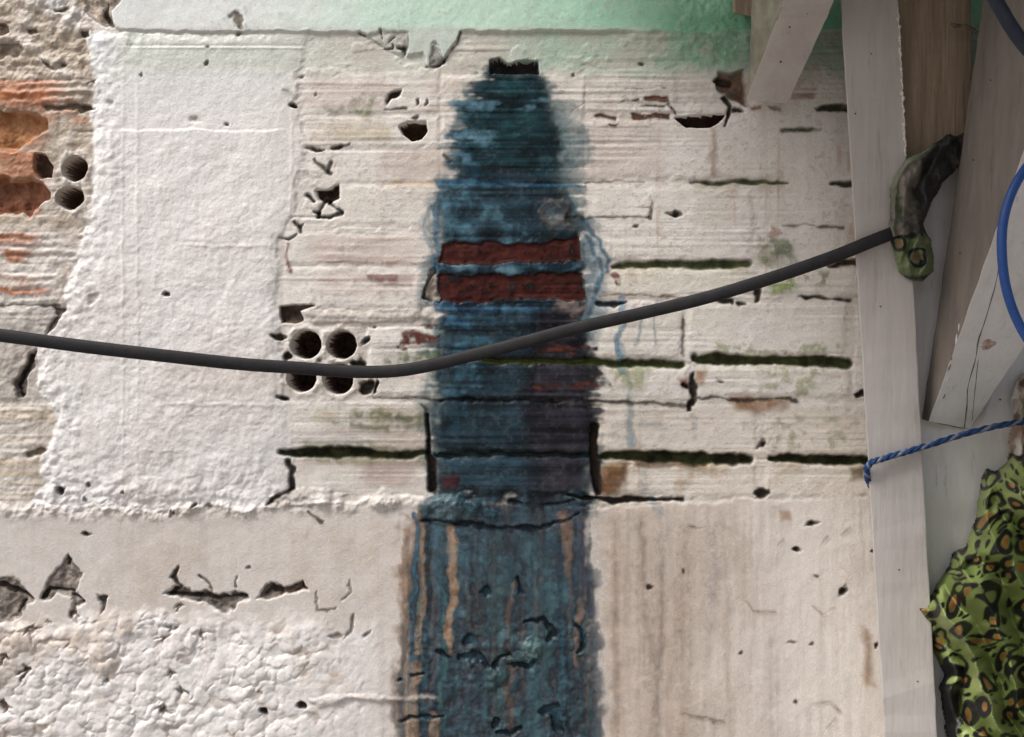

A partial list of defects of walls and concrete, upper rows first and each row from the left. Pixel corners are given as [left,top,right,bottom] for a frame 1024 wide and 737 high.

spalling [359,30,408,55]
spalling [427,32,462,68]
spalling [59,158,88,210]
crack [310,145,344,175]
crack [285,221,303,240]
peeling [423,237,585,304]
leakage [614,296,626,374]
leakage [397,65,610,737]
crack [267,319,868,532]
spalling [0,555,85,622]
spalling [166,566,307,612]